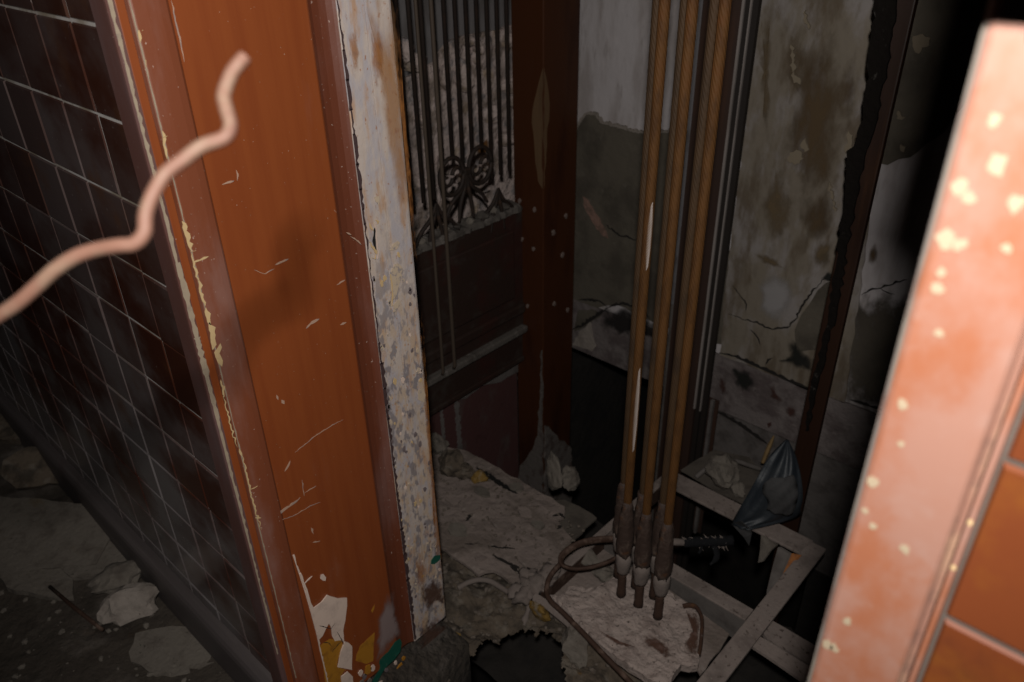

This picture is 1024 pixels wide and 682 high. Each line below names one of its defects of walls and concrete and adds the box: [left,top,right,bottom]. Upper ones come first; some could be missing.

peeling [107,0,156,176]
spalling [129,0,169,160]
rust [374,41,410,191]
water stain [794,60,852,179]
water stain [808,200,831,281]
peeling [292,0,441,682]
crack [720,279,824,389]
peeling [159,178,297,678]